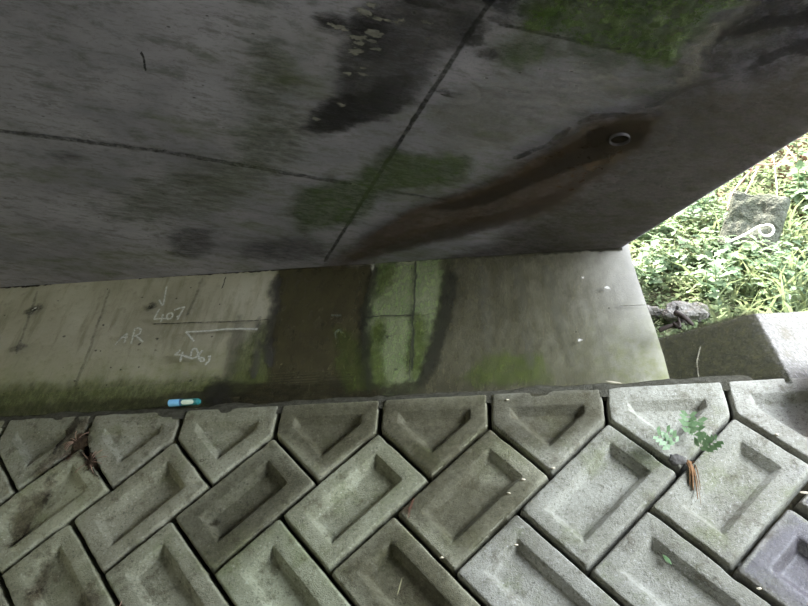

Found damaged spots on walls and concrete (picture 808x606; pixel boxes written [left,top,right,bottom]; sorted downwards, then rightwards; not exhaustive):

water stain [120,0,808,543]
rust [331,117,654,268]